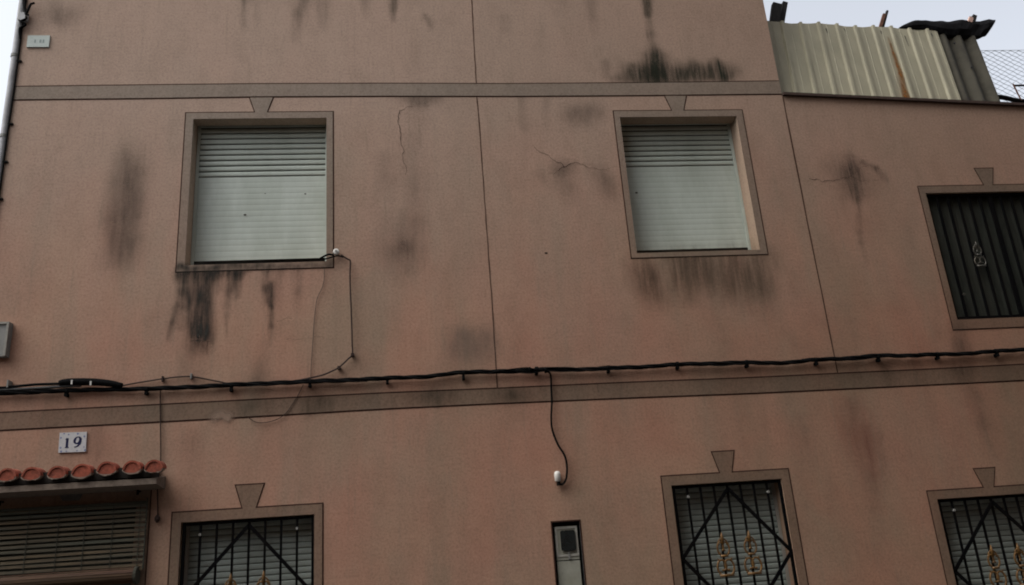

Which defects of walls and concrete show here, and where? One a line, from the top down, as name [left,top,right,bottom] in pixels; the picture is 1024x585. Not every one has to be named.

leakage [627,51,731,83]
corrosion [890,43,910,98]
leakage [177,264,241,349]